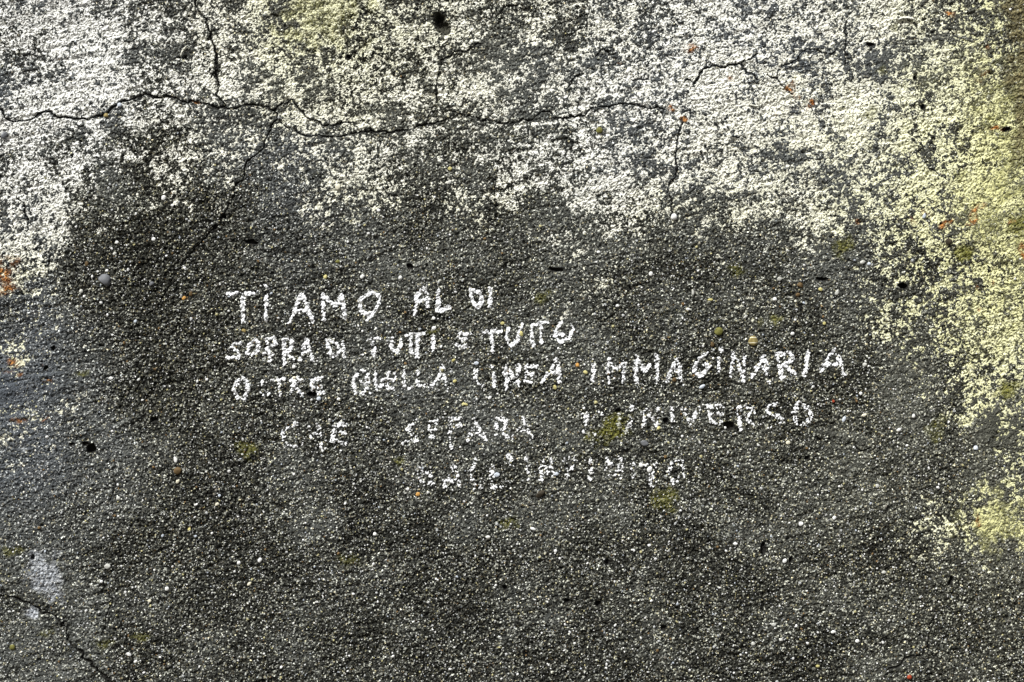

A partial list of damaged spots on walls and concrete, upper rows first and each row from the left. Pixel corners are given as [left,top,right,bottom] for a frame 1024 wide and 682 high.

crack [685,21,847,95]
crack [0,0,683,315]
leakage [30,552,61,601]
crack [0,594,112,682]